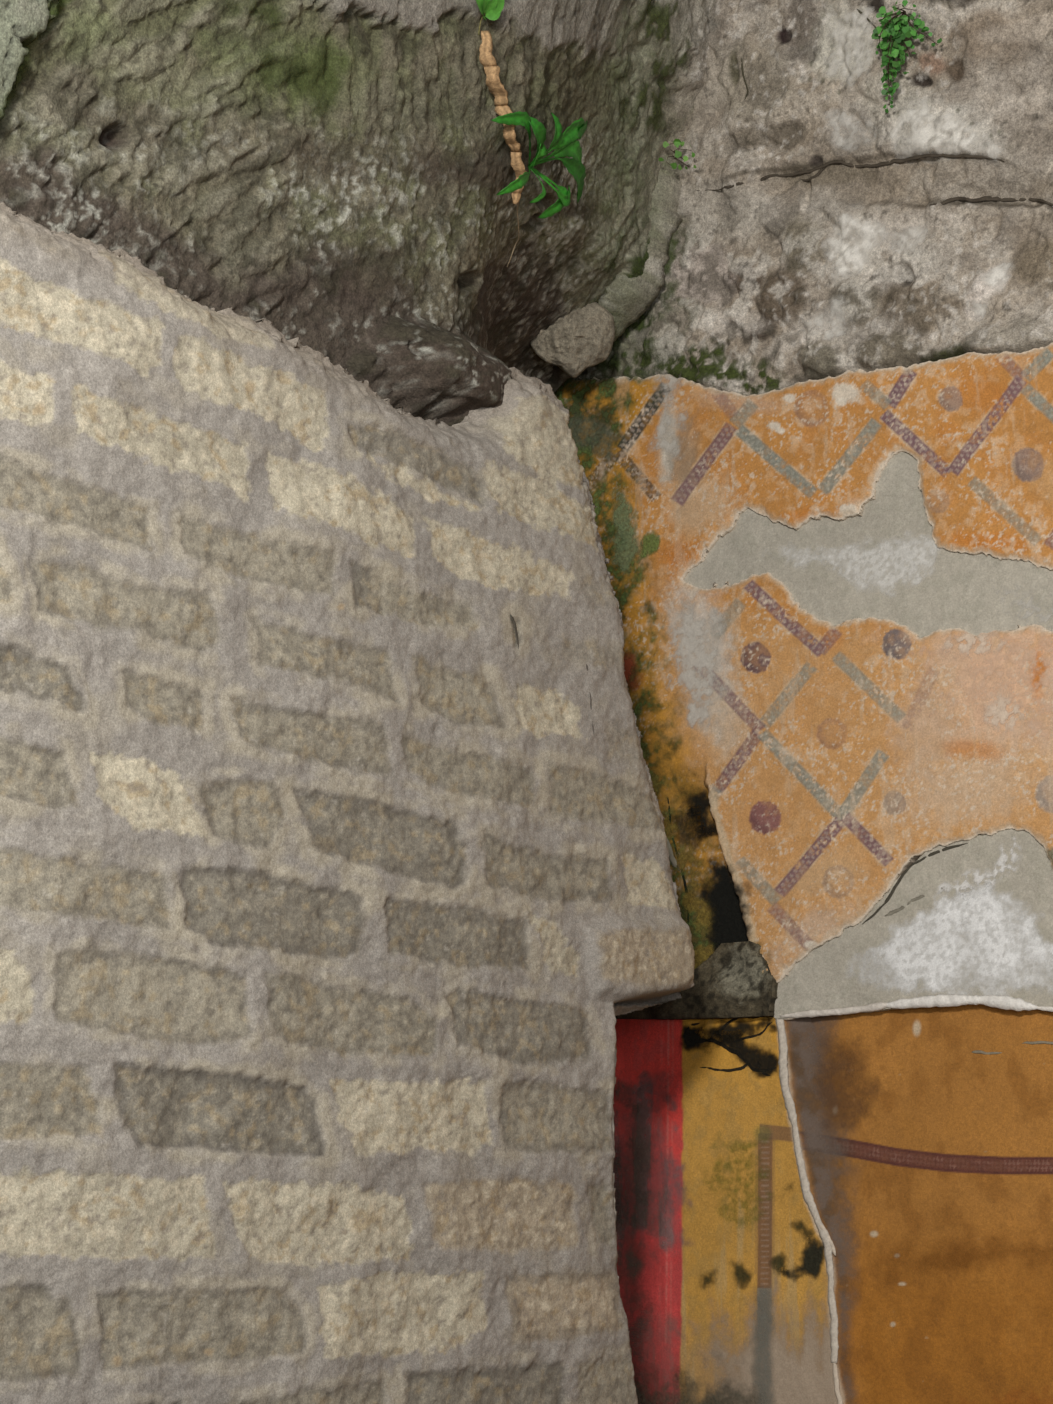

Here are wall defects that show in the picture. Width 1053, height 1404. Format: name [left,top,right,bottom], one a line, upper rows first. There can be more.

crack [697,153,1004,191]
crack [929,196,1053,206]
leakage [569,418,614,459]
leakage [612,496,660,571]
flaking render [684,452,1053,735]
leakage [624,654,638,688]
flaking render [669,605,724,727]
flaking render [709,829,1053,1404]
leakage [613,1080,682,1278]
leakage [772,1016,865,1331]
leakage [735,1265,751,1287]